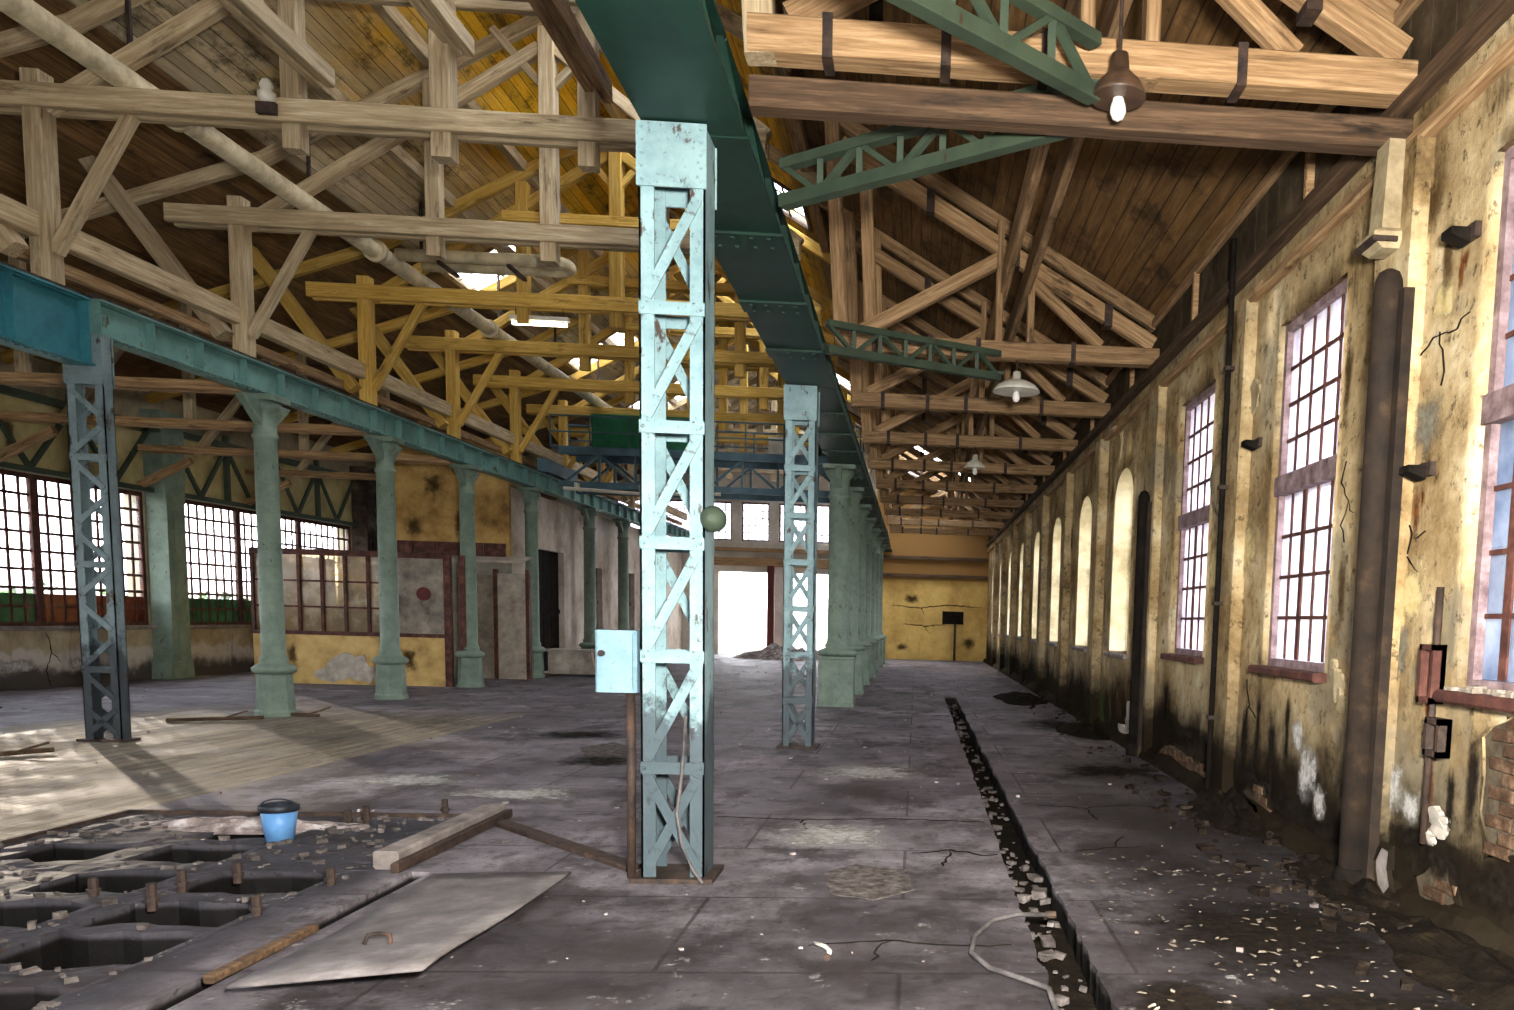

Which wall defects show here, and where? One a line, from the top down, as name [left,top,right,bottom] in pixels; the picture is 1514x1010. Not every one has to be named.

crack [1420,312,1470,386]
peeling [313,652,376,683]
leakage [1064,764,1162,777]
leakage [1233,699,1335,843]
leakage [1446,740,1480,833]
spalling [1477,713,1514,863]
leakage [1389,770,1514,911]